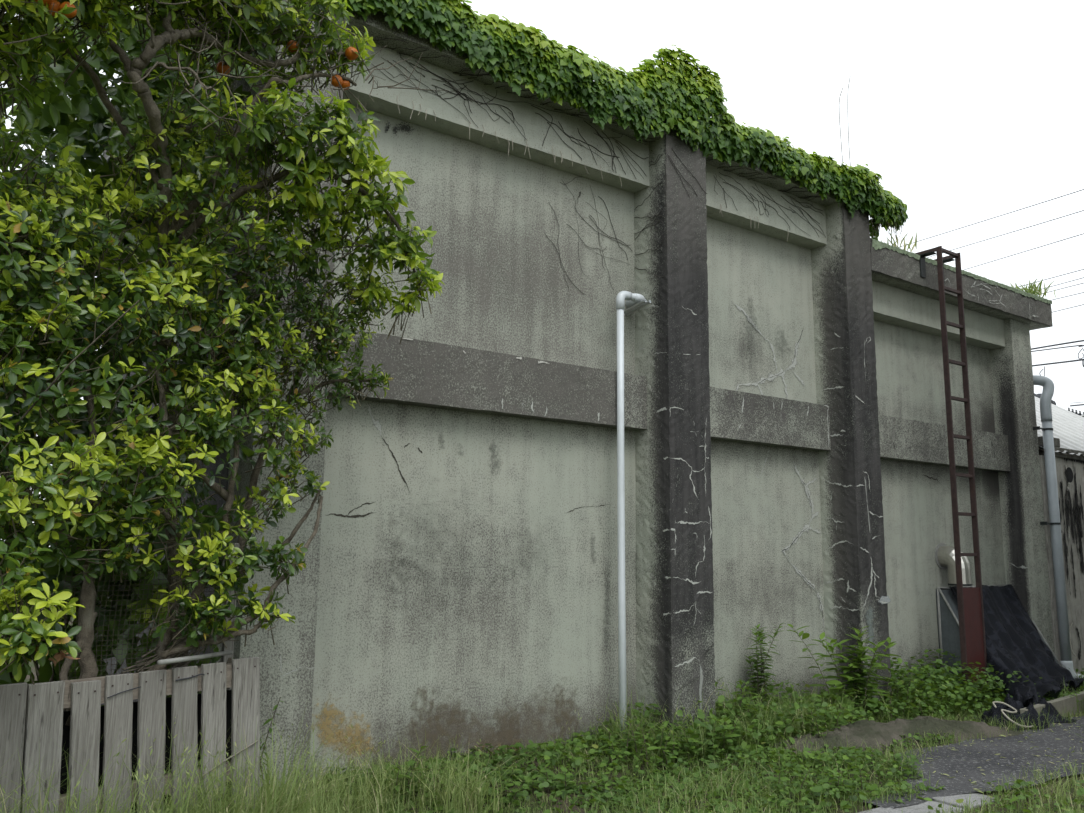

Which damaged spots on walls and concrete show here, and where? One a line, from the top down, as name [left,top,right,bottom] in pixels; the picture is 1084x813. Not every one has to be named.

crack [326,502,374,518]
crack [367,405,422,491]
crack [656,407,712,623]
crack [781,462,889,626]
water stain [1059,458,1084,597]